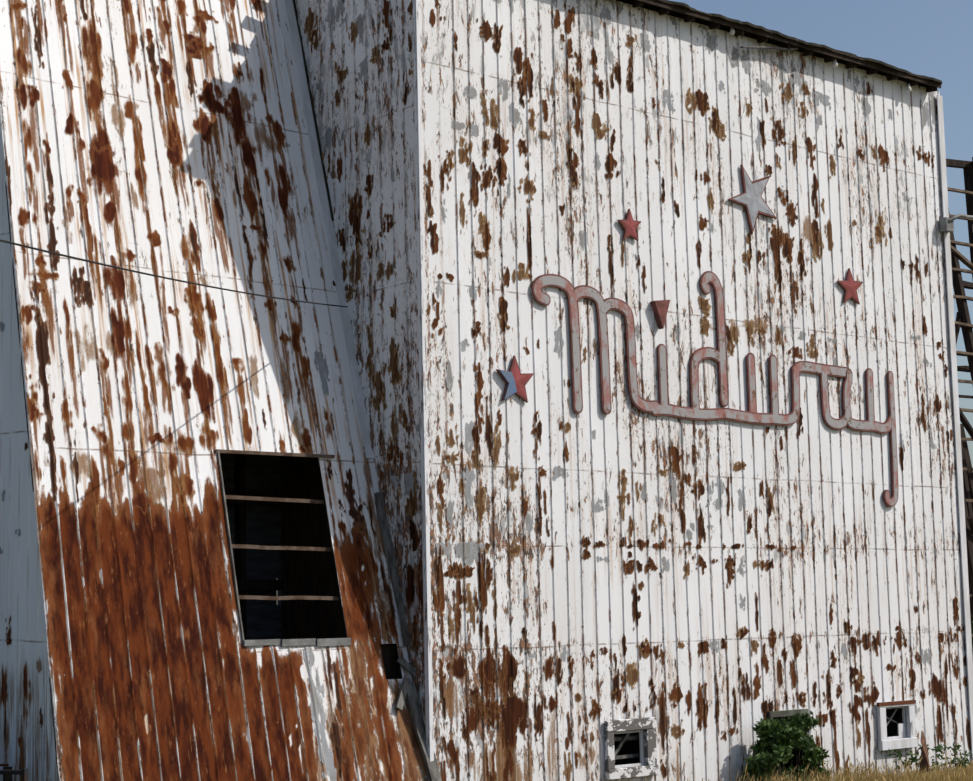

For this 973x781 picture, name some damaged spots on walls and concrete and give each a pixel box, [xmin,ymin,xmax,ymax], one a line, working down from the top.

rust [0,0,333,781]
rust [326,468,429,781]
peeling [350,319,576,781]
peeling [564,693,602,781]
peeling [580,536,610,563]
peeling [591,445,971,779]
peeling [921,393,942,449]
peeling [923,341,948,377]